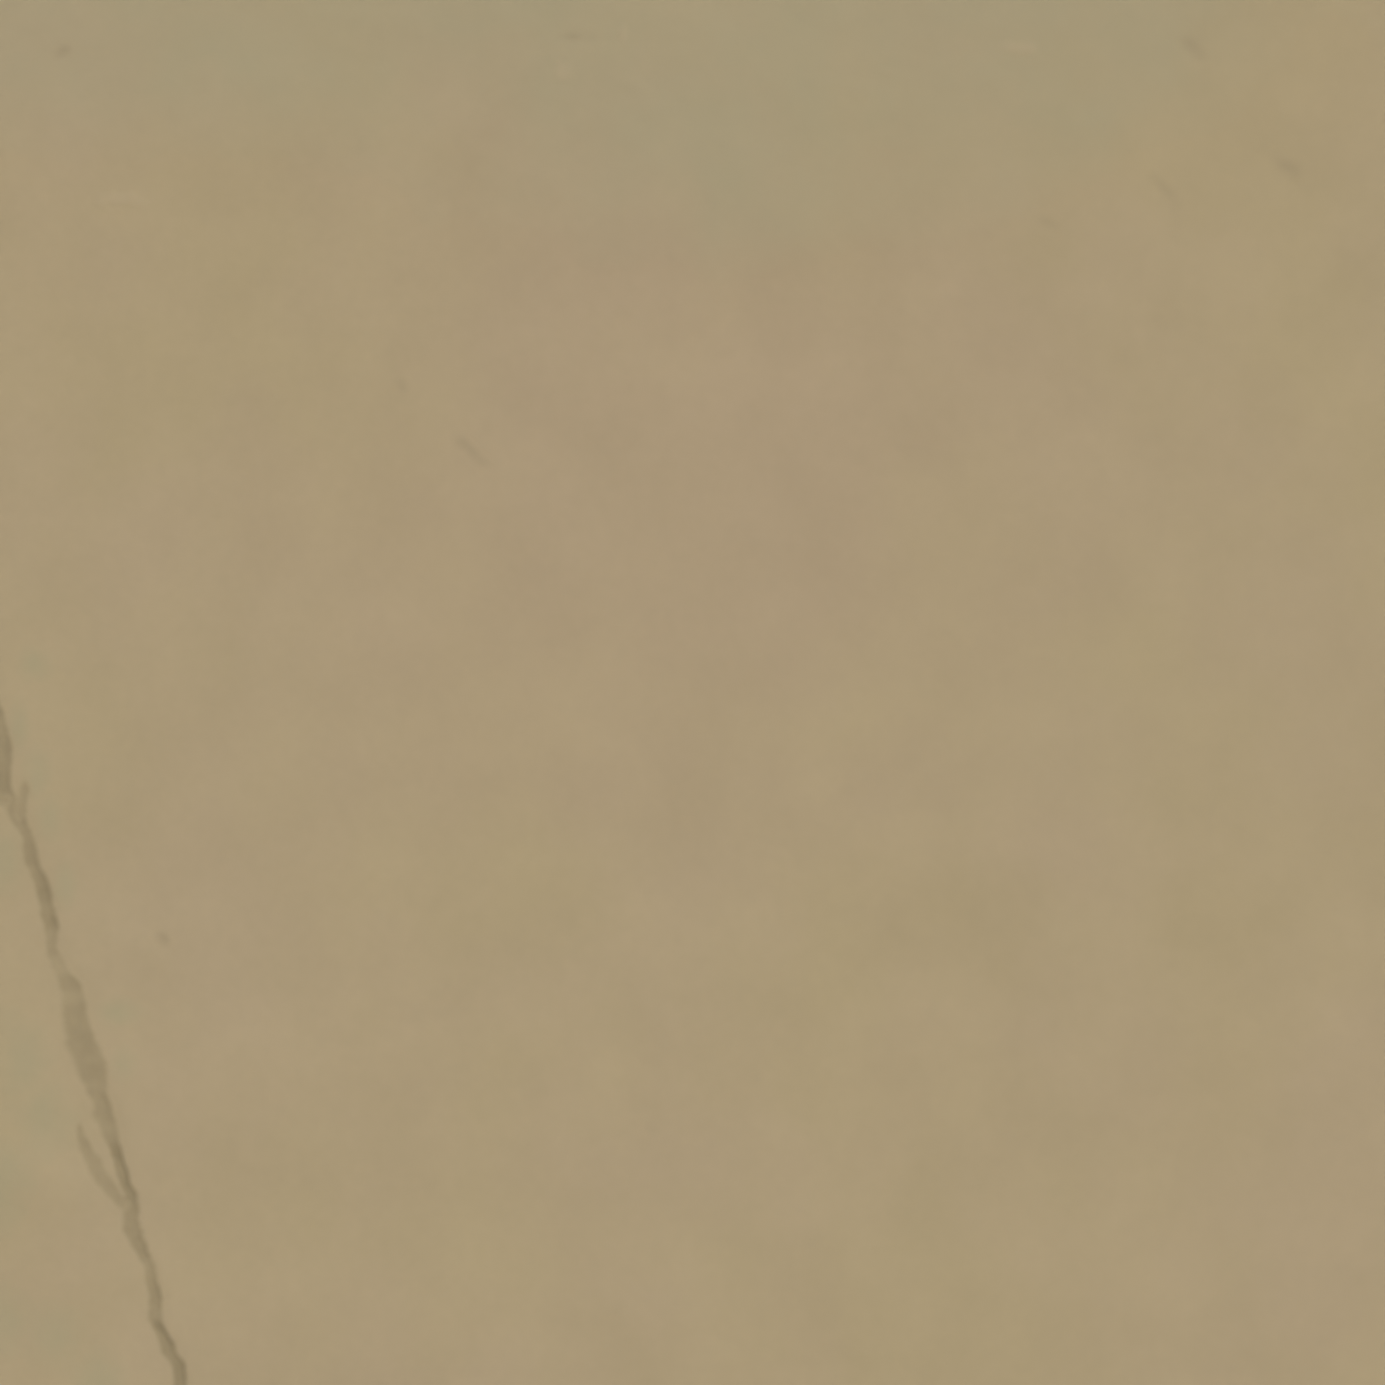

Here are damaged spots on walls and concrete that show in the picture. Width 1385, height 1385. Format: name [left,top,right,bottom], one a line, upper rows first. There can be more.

crack [0,701,189,1385]